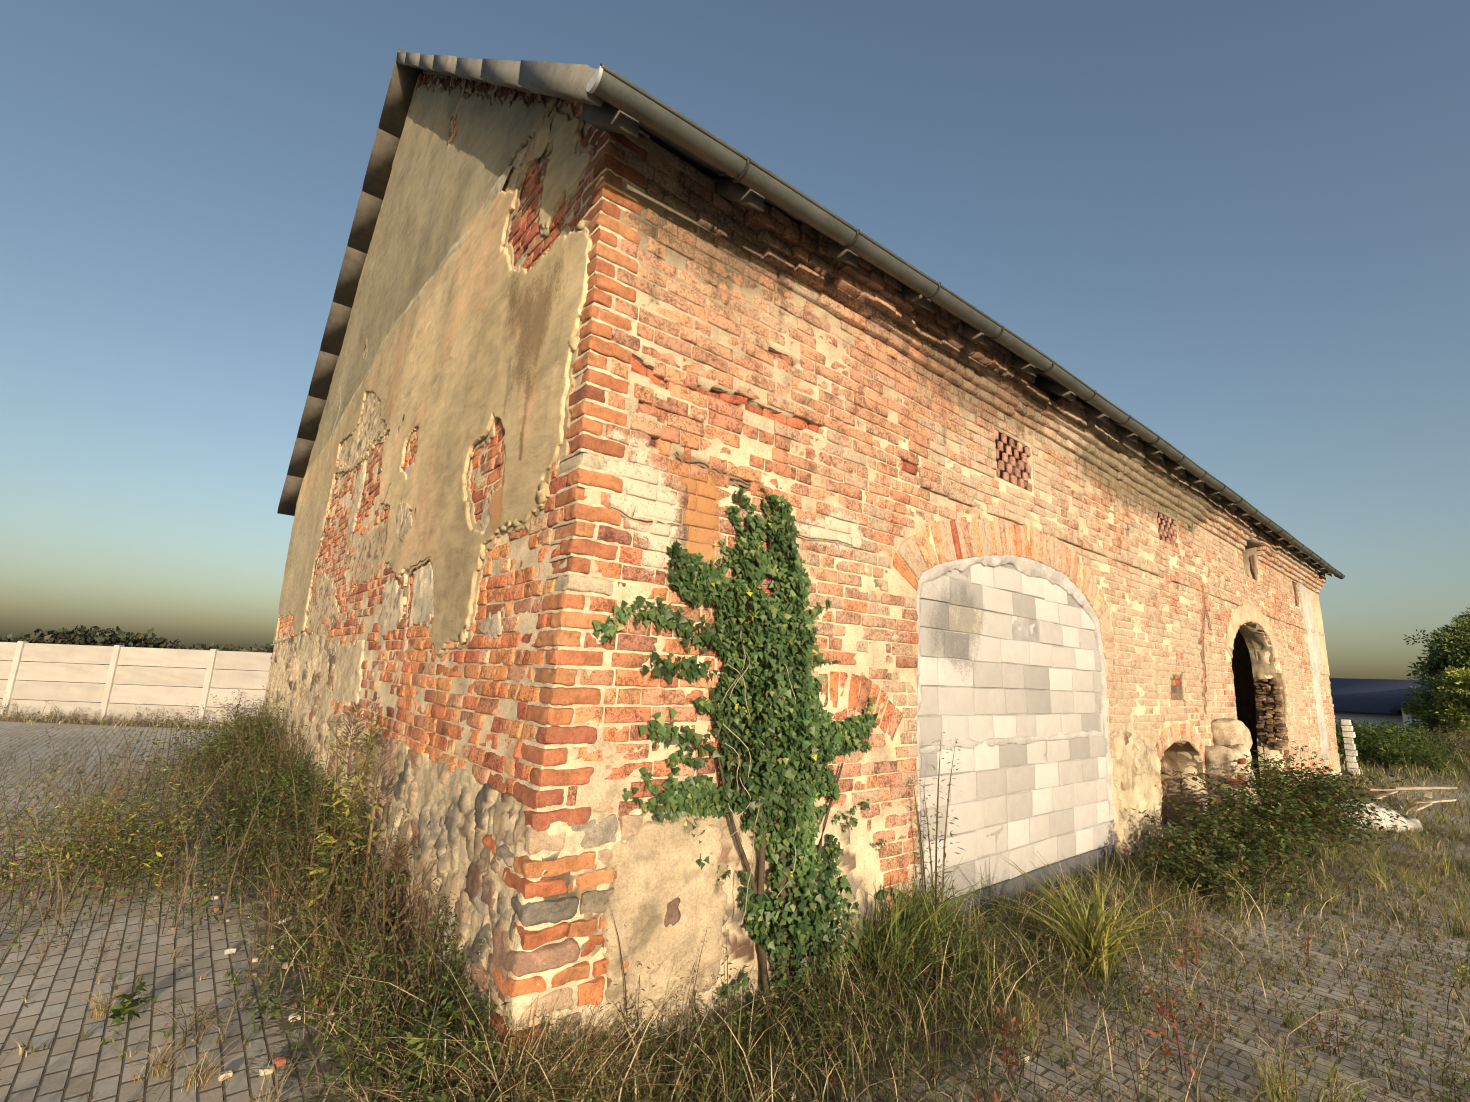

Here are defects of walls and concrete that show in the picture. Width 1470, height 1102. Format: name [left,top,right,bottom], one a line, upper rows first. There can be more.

flaking render [419,74,598,272]
leakage [510,264,559,384]
flaking render [564,337,585,424]
flaking render [272,392,571,810]